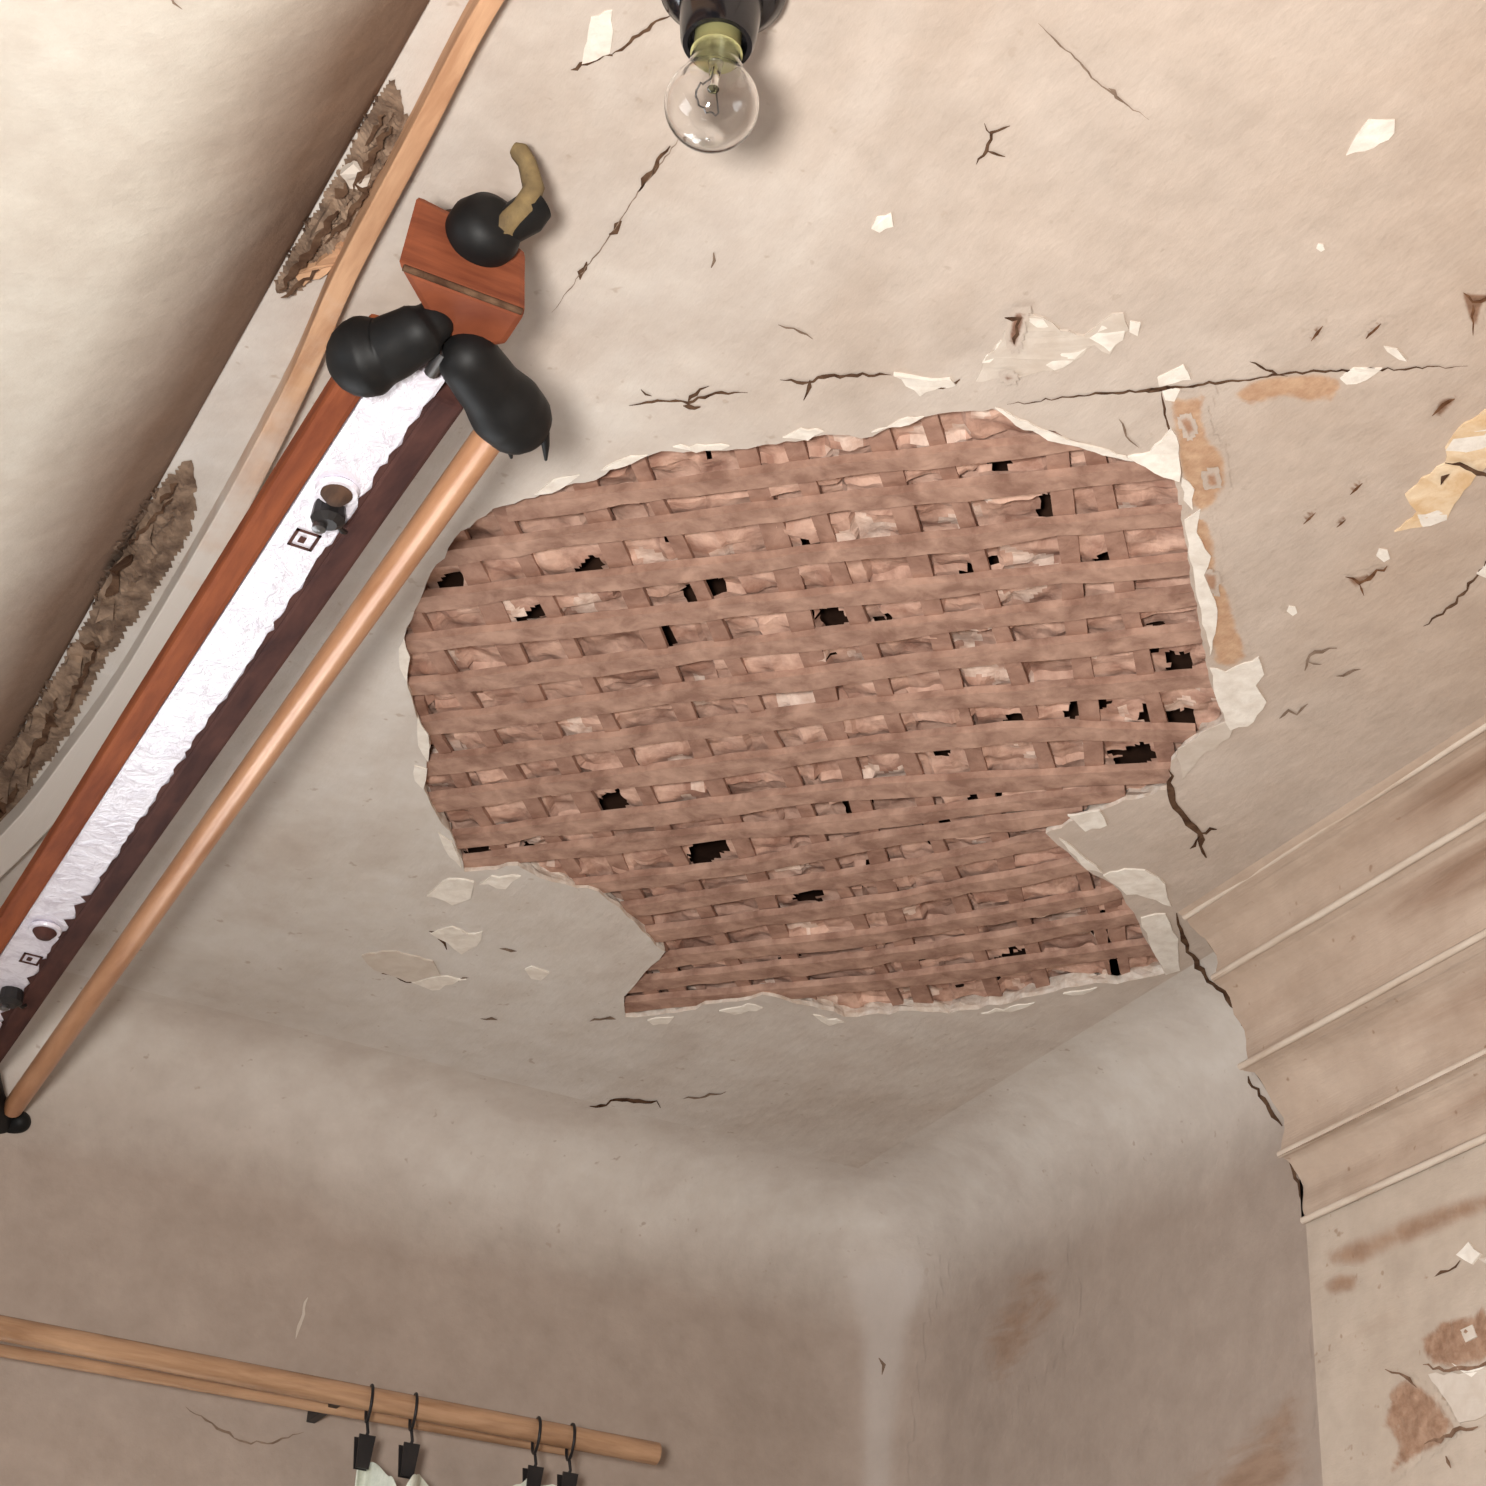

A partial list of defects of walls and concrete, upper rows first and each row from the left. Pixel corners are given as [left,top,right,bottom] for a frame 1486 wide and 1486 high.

spalling [274,80,409,298]
crack [551,140,678,313]
crack [629,386,748,410]
crack [783,372,960,399]
crack [1012,362,1461,448]
peeling [1394,392,1486,532]
spalling [0,460,197,822]
peeling [995,407,1266,779]
crack [1167,771,1217,858]
peeling [1059,838,1180,975]
crack [1176,913,1242,1026]
spalling [1378,1301,1486,1484]